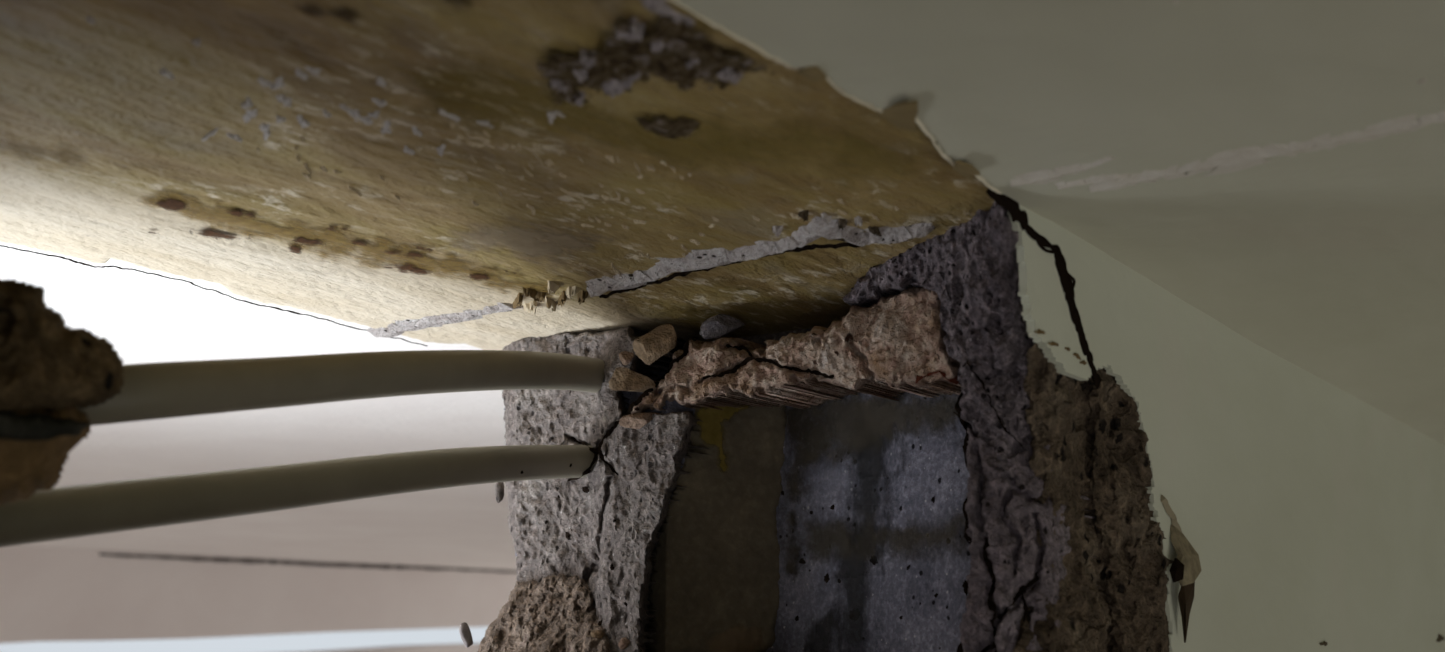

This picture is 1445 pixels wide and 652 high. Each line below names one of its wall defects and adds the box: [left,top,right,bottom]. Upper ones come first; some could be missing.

water stain [201,65,392,143]
water stain [437,107,494,128]
water stain [547,109,567,124]
spalling [536,0,1002,194]
peeling [440,124,692,230]
crack [599,242,861,299]
crack [986,111,1445,389]
spalling [1033,329,1087,365]
crack [567,337,834,482]
crack [915,361,1101,652]
peeling [1160,495,1202,643]